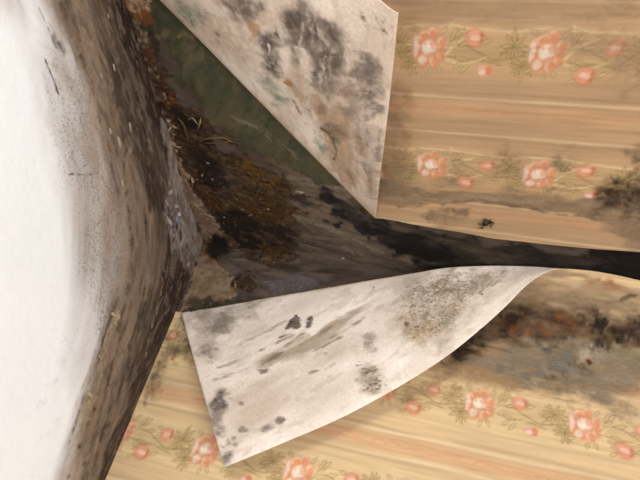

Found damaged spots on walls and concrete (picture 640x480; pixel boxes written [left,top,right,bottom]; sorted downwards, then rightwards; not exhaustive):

water stain [46,0,258,480]
flaking render [125,0,434,312]
water stain [225,0,640,403]